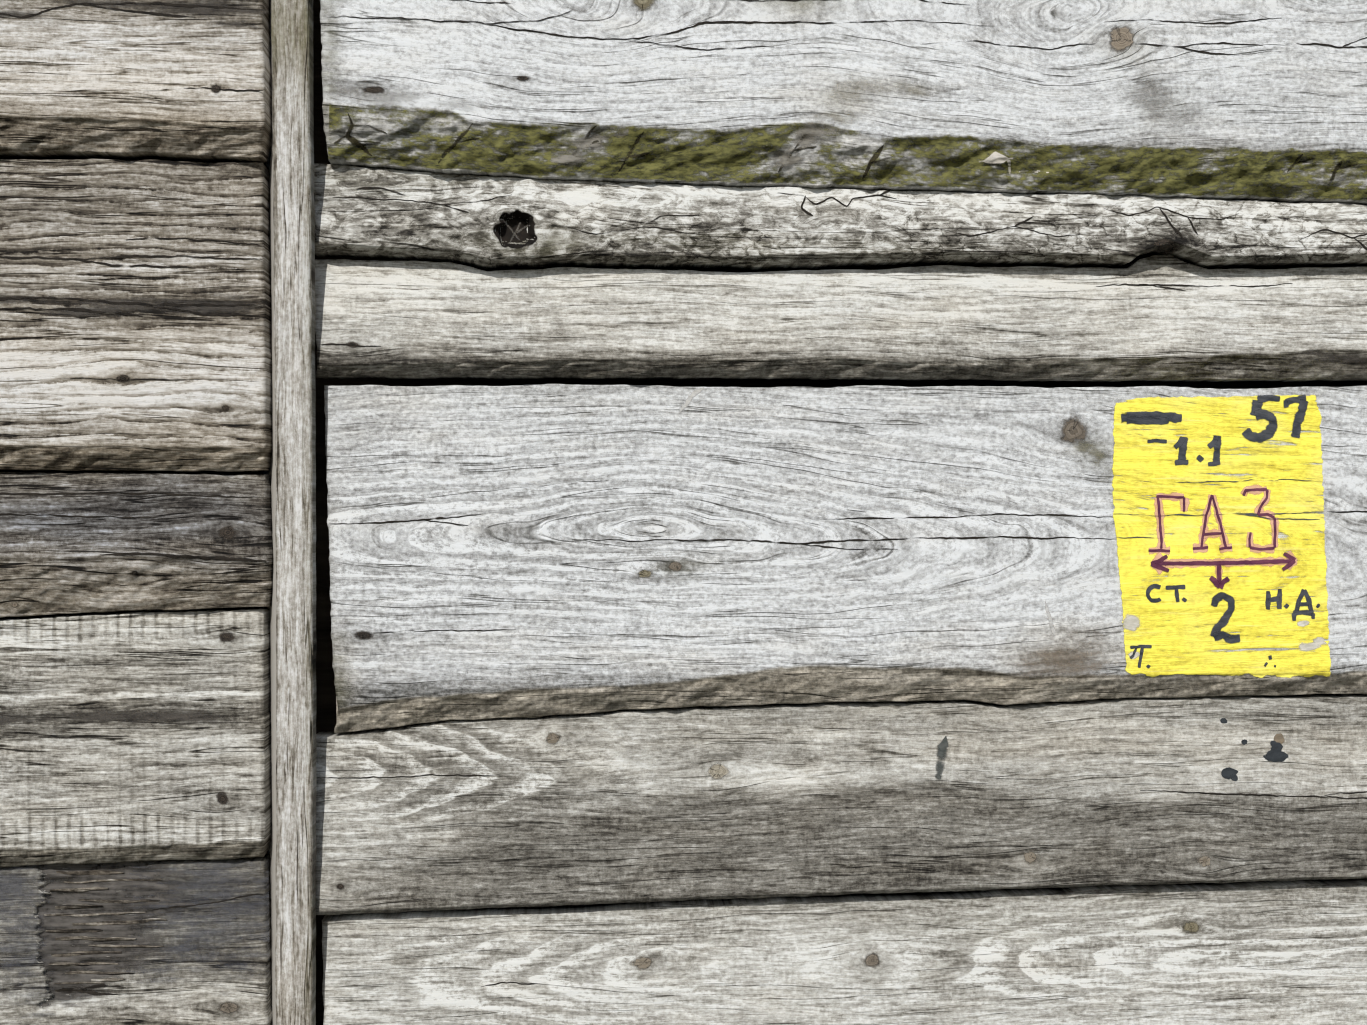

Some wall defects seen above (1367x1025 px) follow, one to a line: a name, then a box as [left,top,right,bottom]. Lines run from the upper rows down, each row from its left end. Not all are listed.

crack [778,135,896,216]
crack [1302,229,1367,250]